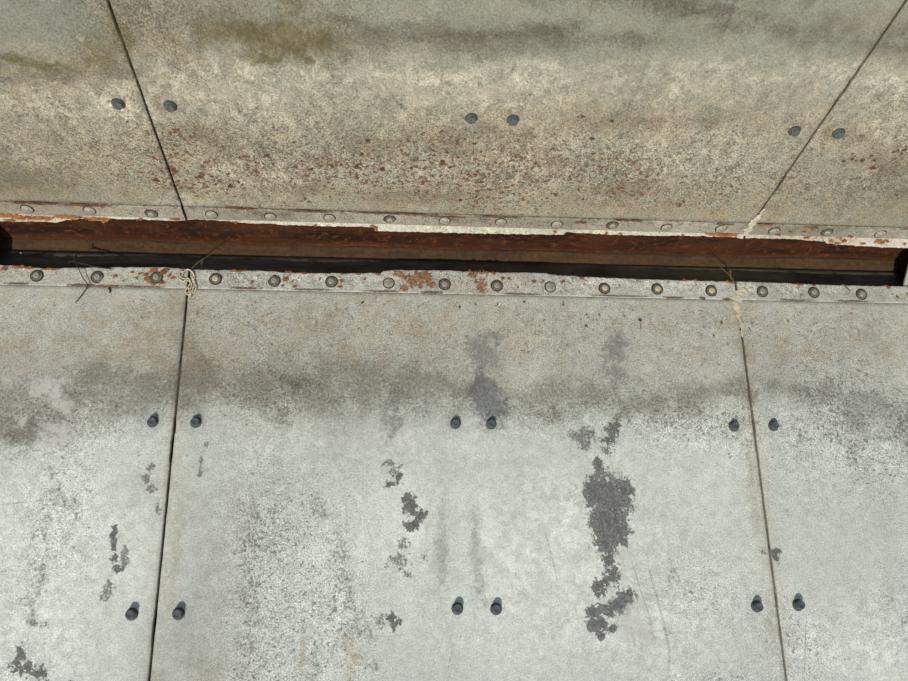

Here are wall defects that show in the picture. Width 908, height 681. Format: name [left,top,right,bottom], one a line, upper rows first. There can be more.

rust [152,152,244,194]
rust [397,129,498,185]
rust [293,198,466,218]
rust [705,223,738,237]
rust [829,236,891,246]
rust [67,268,175,288]
rust [280,271,343,291]
damp [31,378,75,448]
damp [467,372,508,424]
peeling [380,460,428,577]
peeling [569,418,639,641]